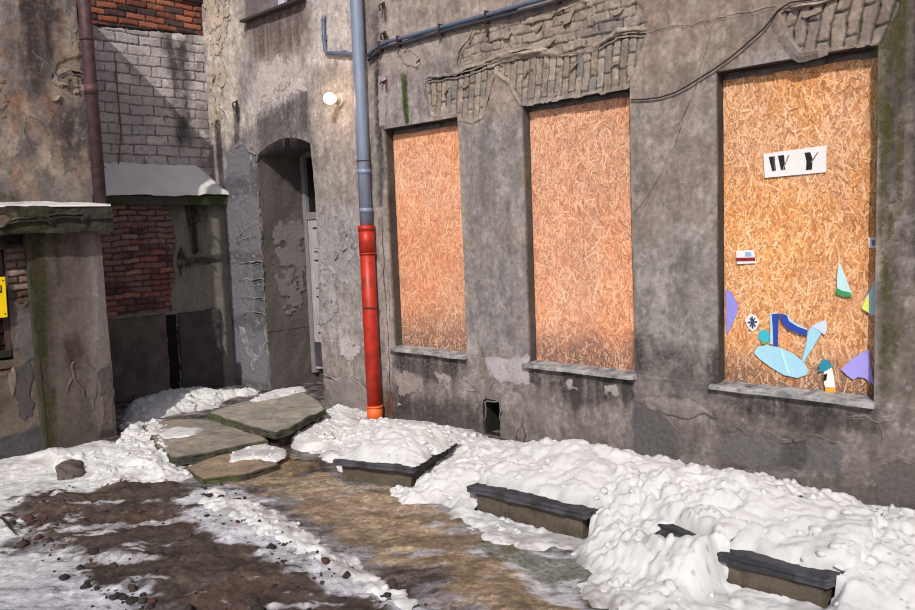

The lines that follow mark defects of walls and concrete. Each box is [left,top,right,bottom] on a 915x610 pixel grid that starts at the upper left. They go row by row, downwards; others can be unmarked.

flaking render [51,24,84,101]
water stain [166,40,190,143]
flaking render [205,0,232,139]
flaking render [377,75,388,127]
water stain [401,74,409,124]
spalling [423,0,651,124]
crack [633,3,804,214]
spalling [770,0,901,63]
water stain [876,96,915,197]
spalling [223,140,307,390]
flaking render [485,353,531,386]